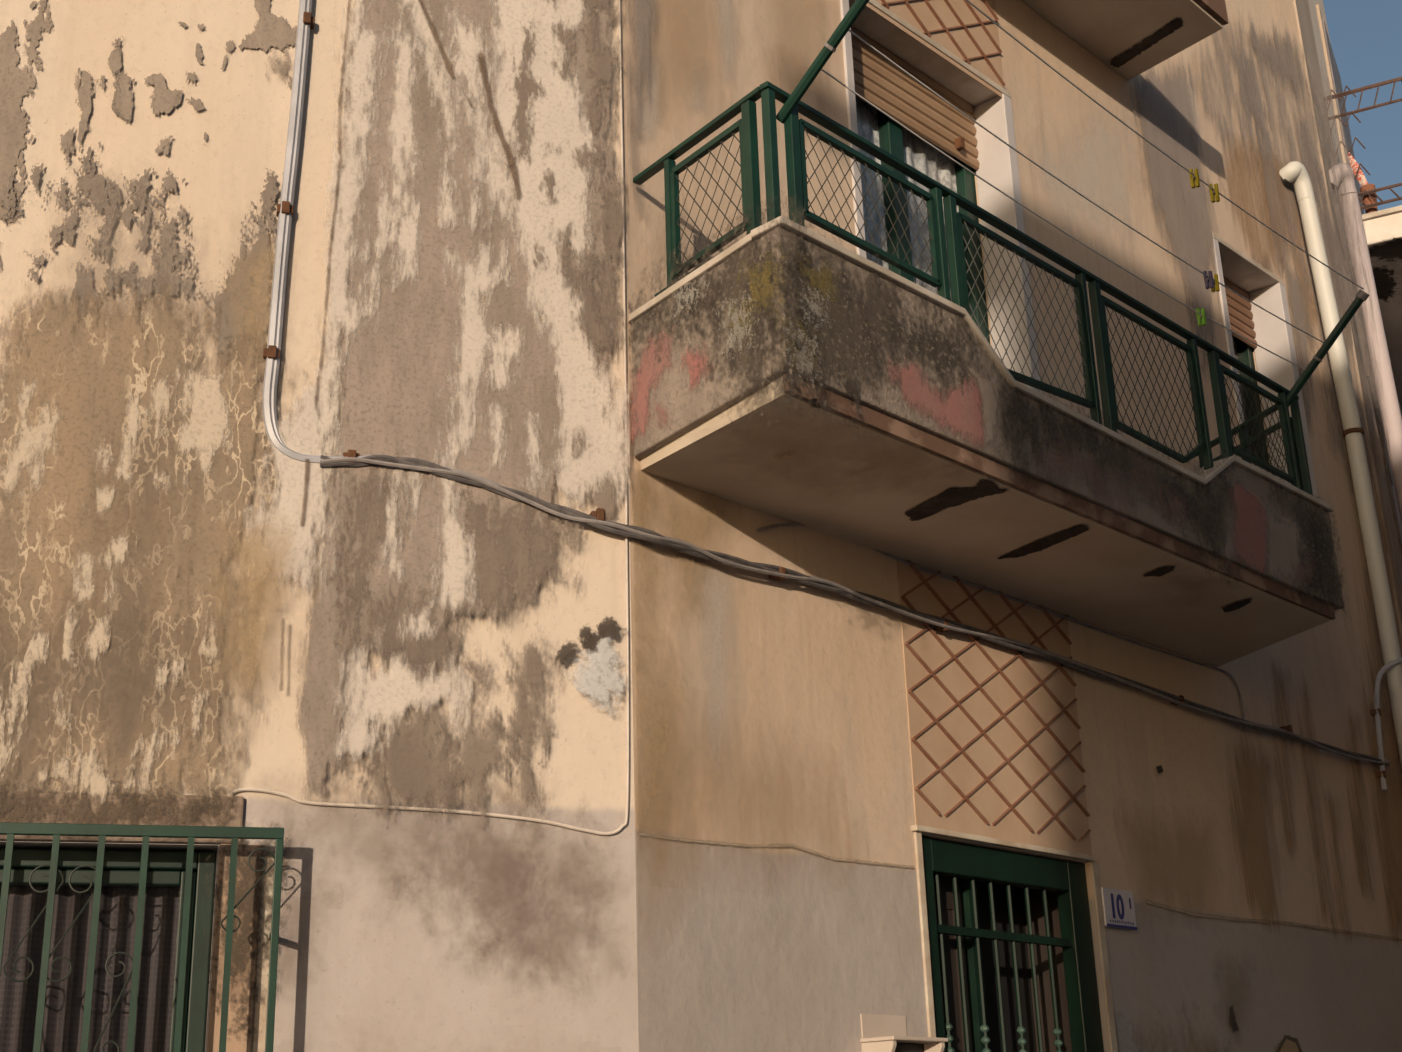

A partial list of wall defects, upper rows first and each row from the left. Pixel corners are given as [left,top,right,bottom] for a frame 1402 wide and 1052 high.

damp [509,30,544,168]
damp [552,0,659,170]
peeling [0,0,297,513]
flaking render [246,0,710,821]
damp [533,198,994,427]
peeling [889,364,997,444]
damp [1135,24,1402,657]
peeling [0,537,128,777]
peeling [38,690,209,802]
damp [0,280,288,1035]
peeling [156,658,185,689]
damp [1234,660,1402,935]